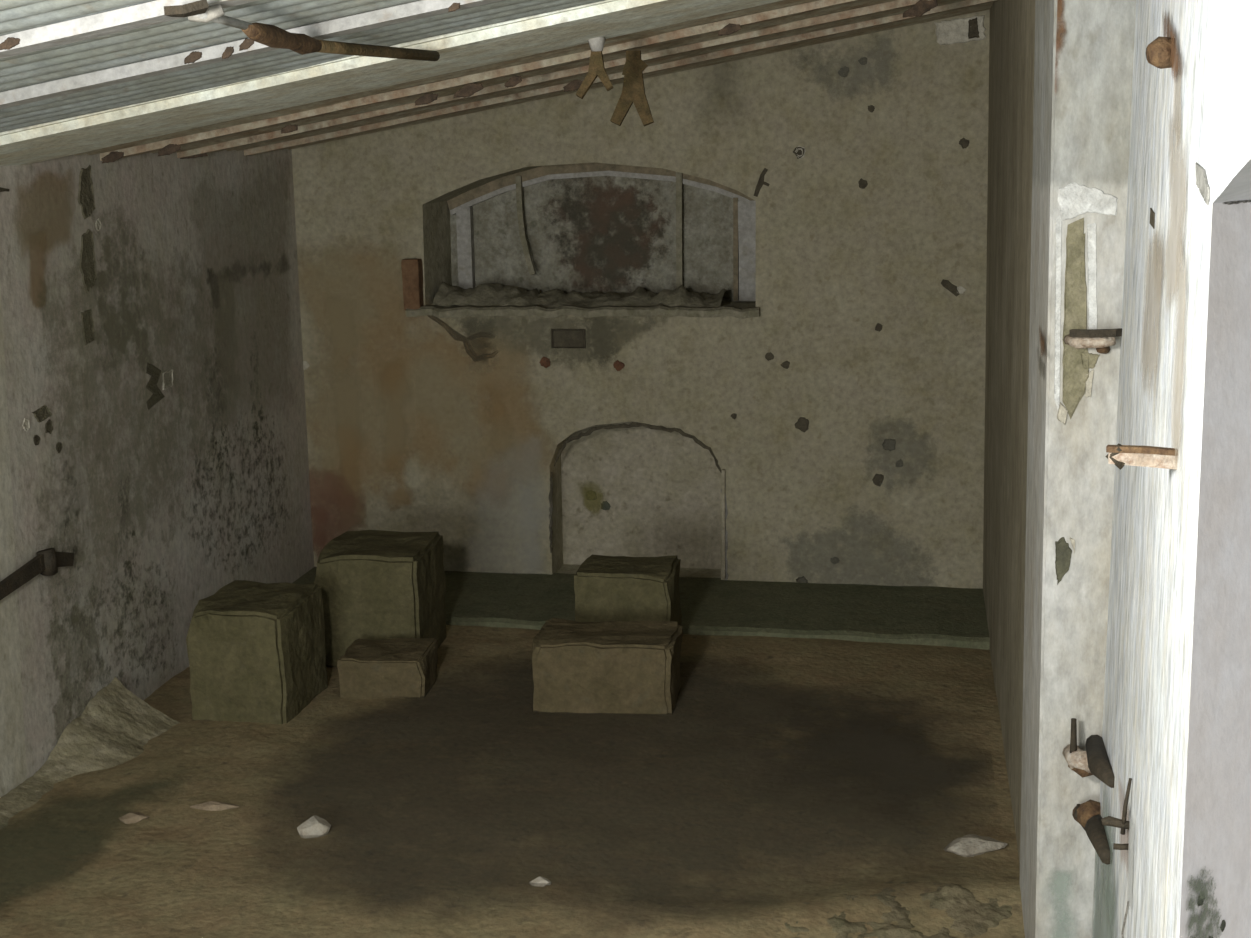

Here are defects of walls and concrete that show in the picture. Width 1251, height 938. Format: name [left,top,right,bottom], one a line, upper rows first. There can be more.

corrosion [0,37,20,50]
corrosion [184,51,202,64]
corrosion [1162,12,1180,77]
leakage [20,175,70,306]
peeling [1054,182,1118,425]
leakage [302,250,546,526]
leakage [1186,870,1226,938]